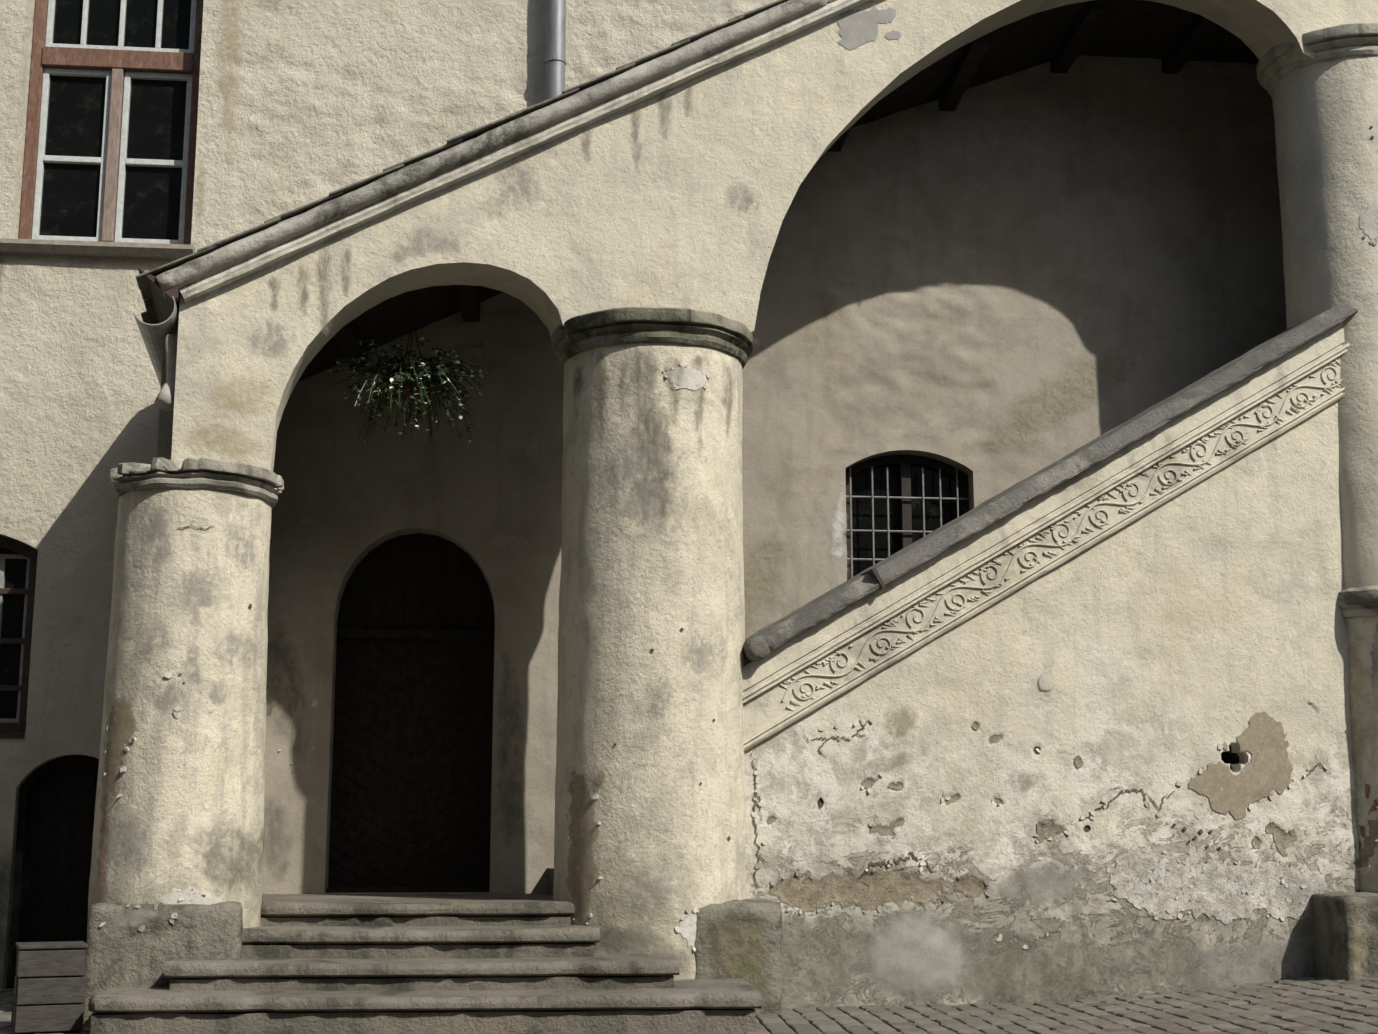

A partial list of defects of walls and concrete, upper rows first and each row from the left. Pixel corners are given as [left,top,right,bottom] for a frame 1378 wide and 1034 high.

leakage [597,357,678,512]
peeling [104,696,137,798]
crack [804,719,874,757]
crack [1302,755,1328,779]
crack [1080,786,1175,820]
peeling [566,766,605,925]
spalling [1033,819,1091,843]
spalling [770,869,990,914]
peeling [1106,820,1328,925]